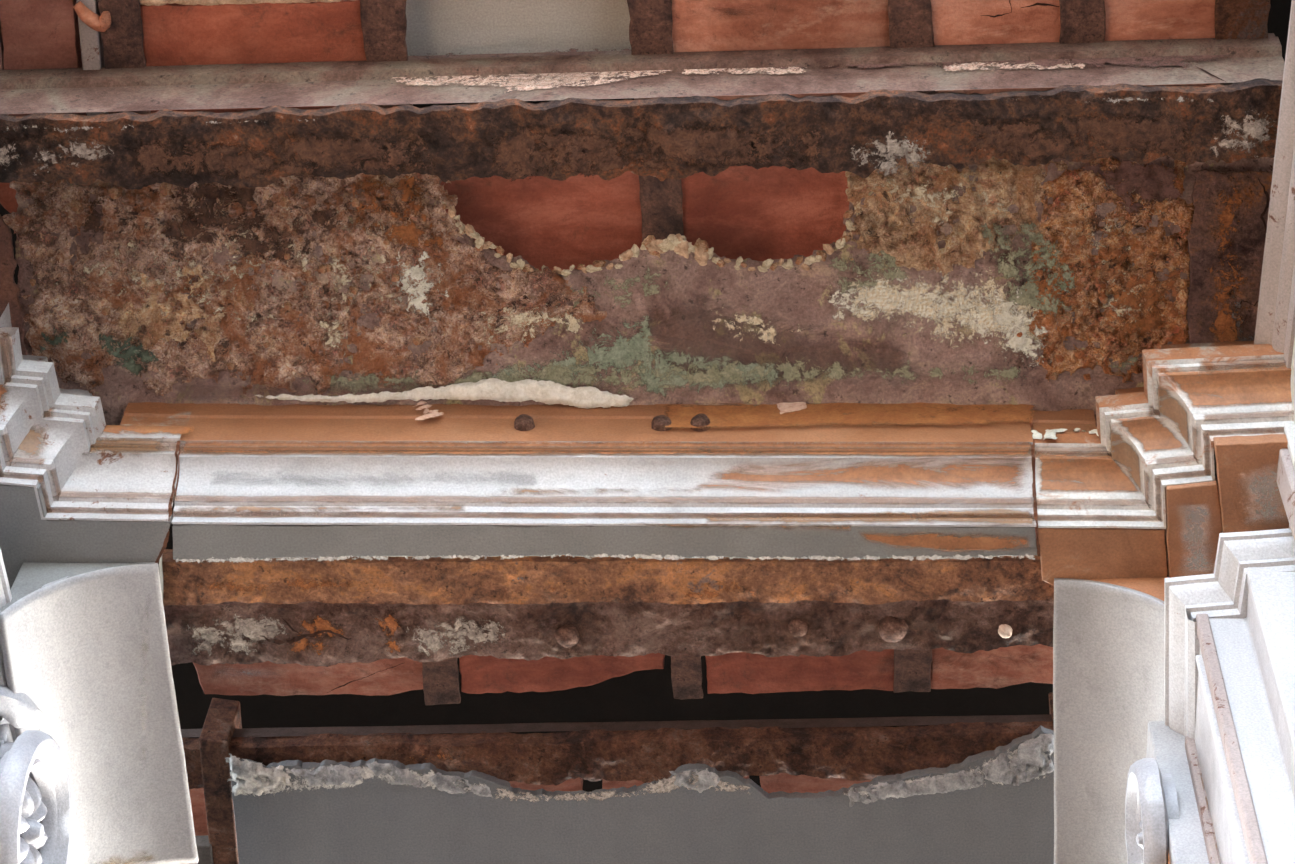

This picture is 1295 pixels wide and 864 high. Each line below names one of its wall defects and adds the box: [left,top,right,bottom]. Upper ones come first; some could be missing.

crack [981,0,1059,18]
corrosion [0,135,114,176]
corrosion [850,131,931,176]
flaking render [442,201,856,276]
corrosion [61,174,445,362]
water stain [710,306,782,346]
water stain [829,264,1051,366]
corrosion [0,359,1294,551]
corrosion [180,614,345,656]
corrosion [375,614,510,657]
peeling [225,754,750,803]
peeling [843,733,1054,807]